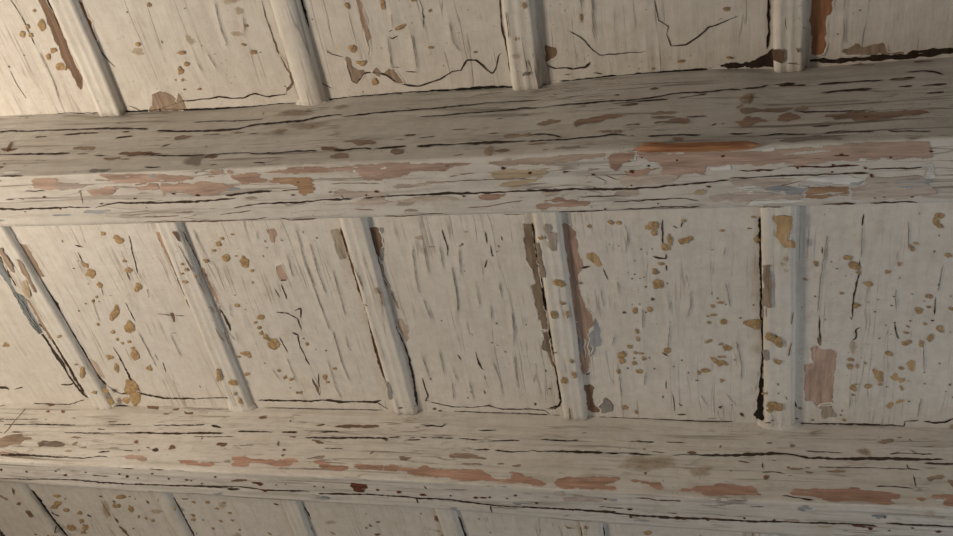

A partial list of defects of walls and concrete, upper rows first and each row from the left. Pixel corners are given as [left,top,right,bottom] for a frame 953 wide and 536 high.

peeling [36,0,86,95]
crack [323,0,509,88]
crack [654,1,737,46]
peeling [807,0,932,63]
crack [0,52,947,168]
peeling [31,140,471,212]
peeling [478,119,935,248]
peeling [0,233,52,340]
crack [0,155,953,536]
peeling [520,220,616,414]
peeling [754,378,764,421]
peeling [312,439,619,505]